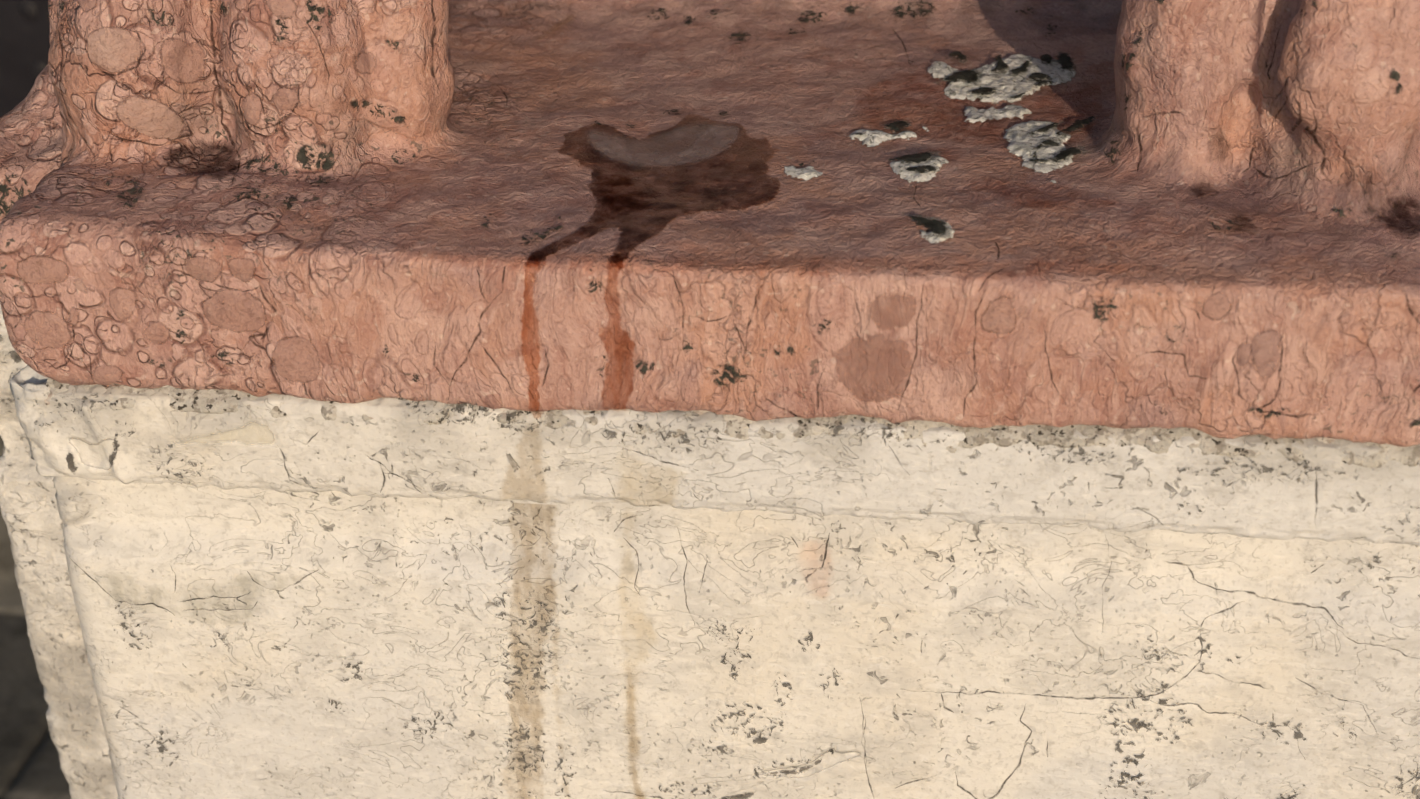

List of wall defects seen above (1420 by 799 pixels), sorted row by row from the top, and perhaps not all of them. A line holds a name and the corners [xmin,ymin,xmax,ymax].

crack [923,562,1406,799]